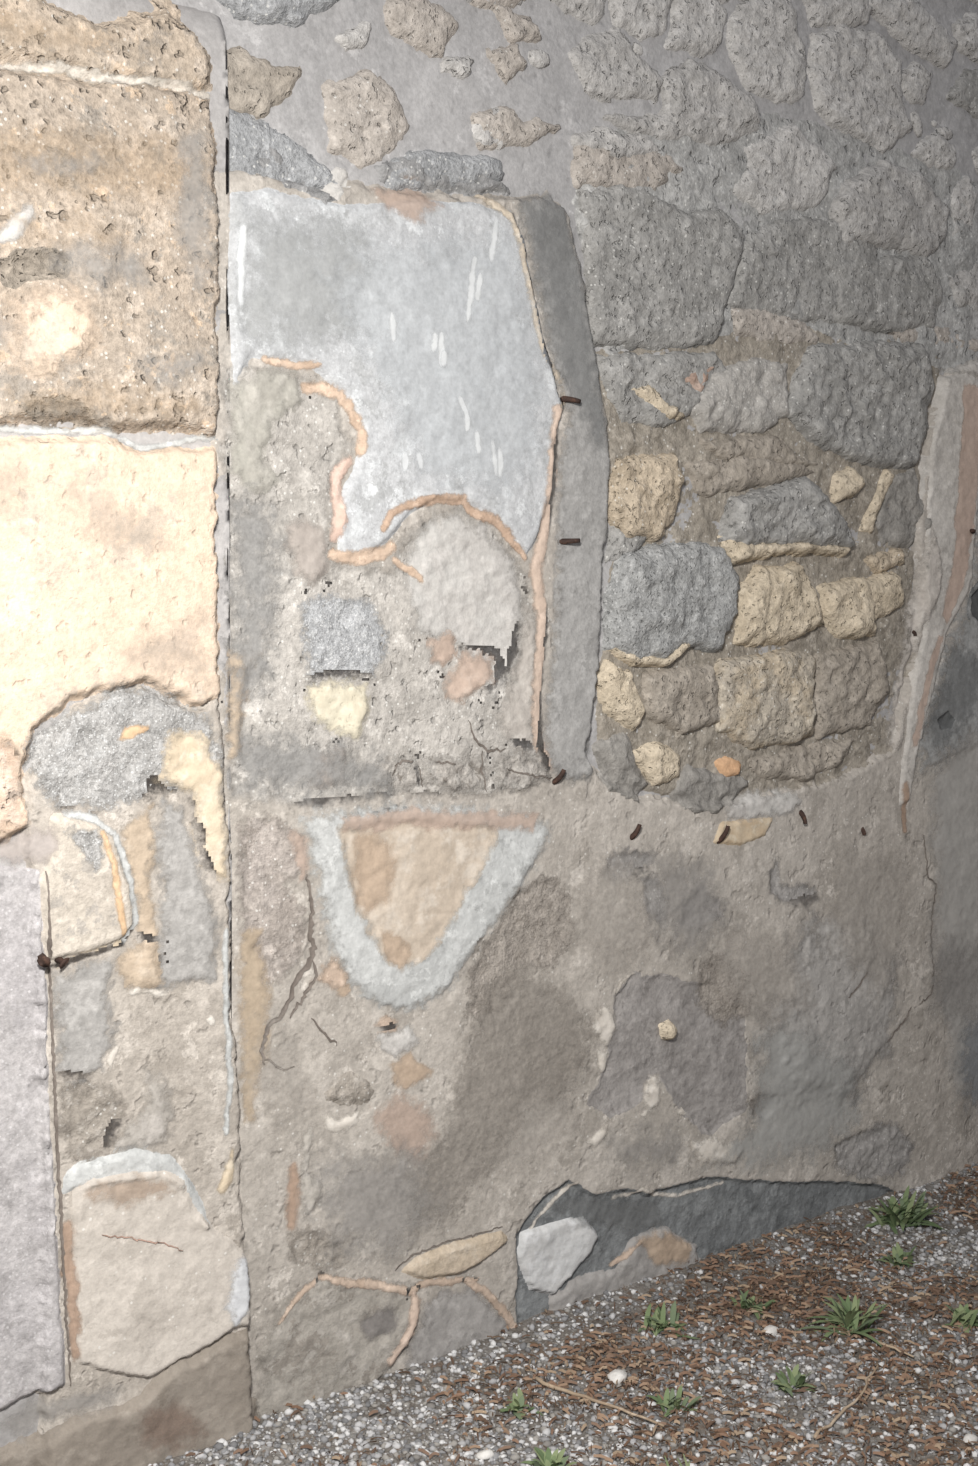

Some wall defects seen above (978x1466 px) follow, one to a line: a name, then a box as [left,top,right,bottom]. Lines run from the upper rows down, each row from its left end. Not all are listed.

spalling [528,49,550,68]
spalling [591,326,978,846]
crack [259,874,337,1070]
flaking render [401,952,894,1324]